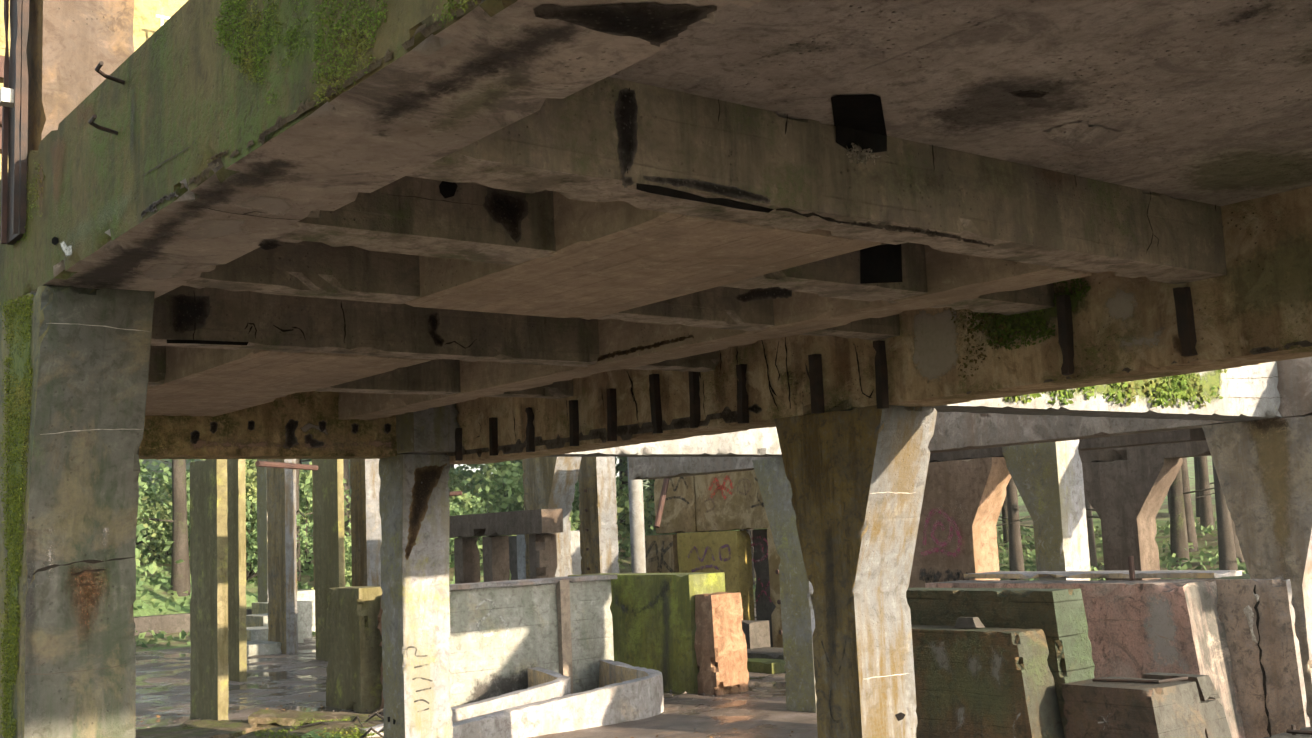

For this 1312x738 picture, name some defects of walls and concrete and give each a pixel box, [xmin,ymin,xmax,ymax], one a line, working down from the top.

damp [936,81,1075,128]
crack [776,208,844,224]
peeling [52,237,72,256]
spalling [258,240,283,250]
crack [245,323,306,340]
spalling [1250,340,1312,355]
crack [699,337,809,417]
spalling [405,404,762,560]
crack [33,557,134,586]
crack [1253,585,1272,737]